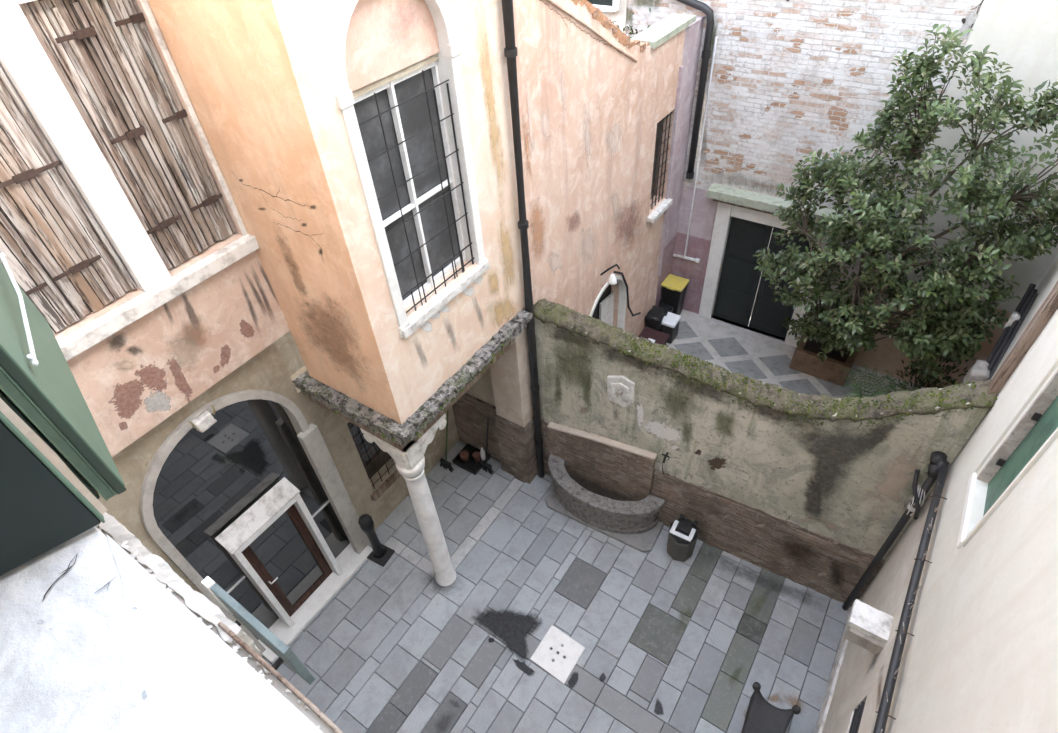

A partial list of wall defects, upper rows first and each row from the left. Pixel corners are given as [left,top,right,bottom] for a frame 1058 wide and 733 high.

crack [236,177,323,260]
damp [182,294,202,346]
flaking render [213,344,231,373]
flaking render [239,320,254,338]
damp [243,268,277,322]
damp [309,309,353,370]
damp [606,350,656,369]
flaking render [109,359,192,431]
damp [581,377,590,413]
damp [665,374,733,443]
damp [745,405,894,544]